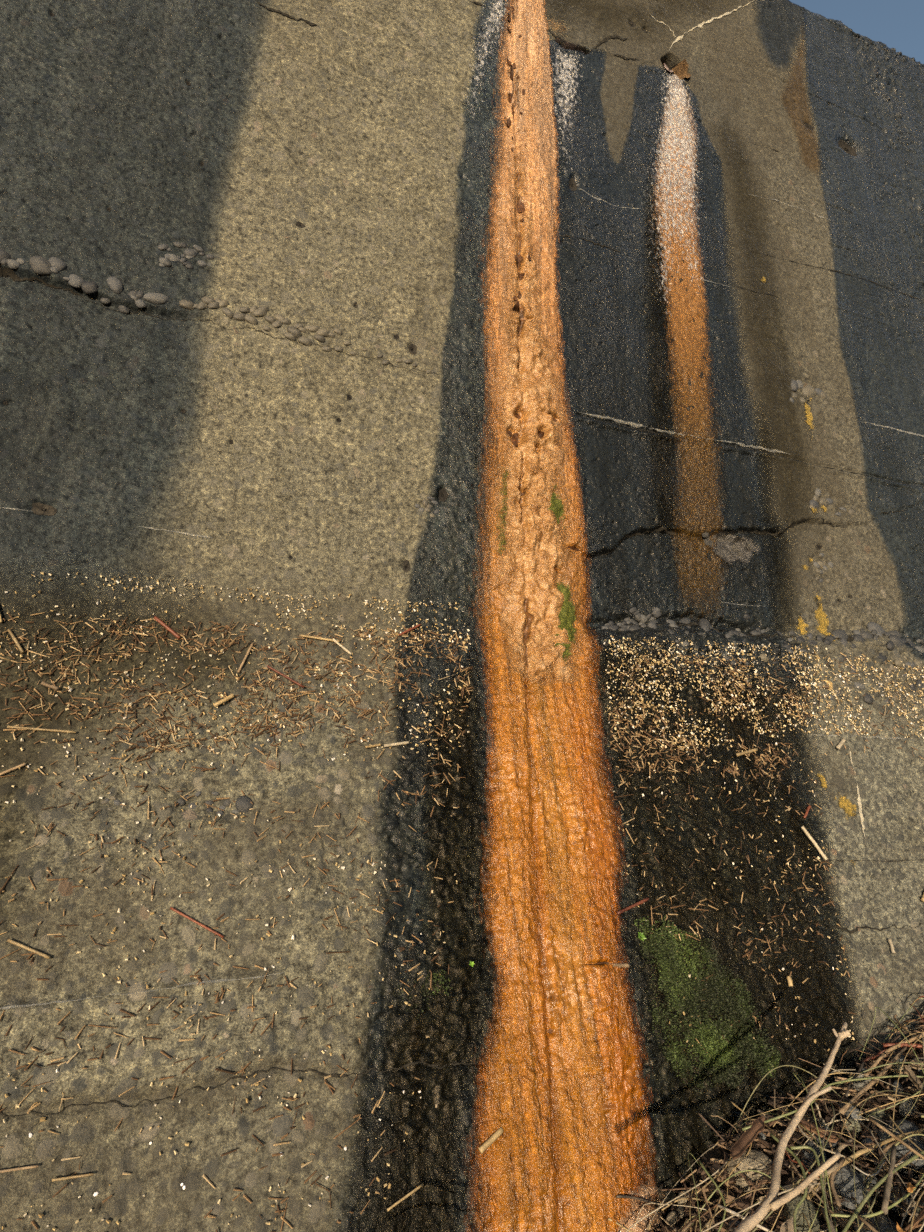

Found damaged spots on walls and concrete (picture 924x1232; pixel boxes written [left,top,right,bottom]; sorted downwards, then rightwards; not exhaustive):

damp [348,370,506,1232]
damp [474,0,513,91]
crack [524,599,537,689]
crack [507,412,557,523]
corrosion [471,0,653,1232]
crack [470,0,754,370]
corrosion [656,75,719,593]
damp [549,41,856,1232]
crack [555,500,924,573]
damp [803,8,924,540]